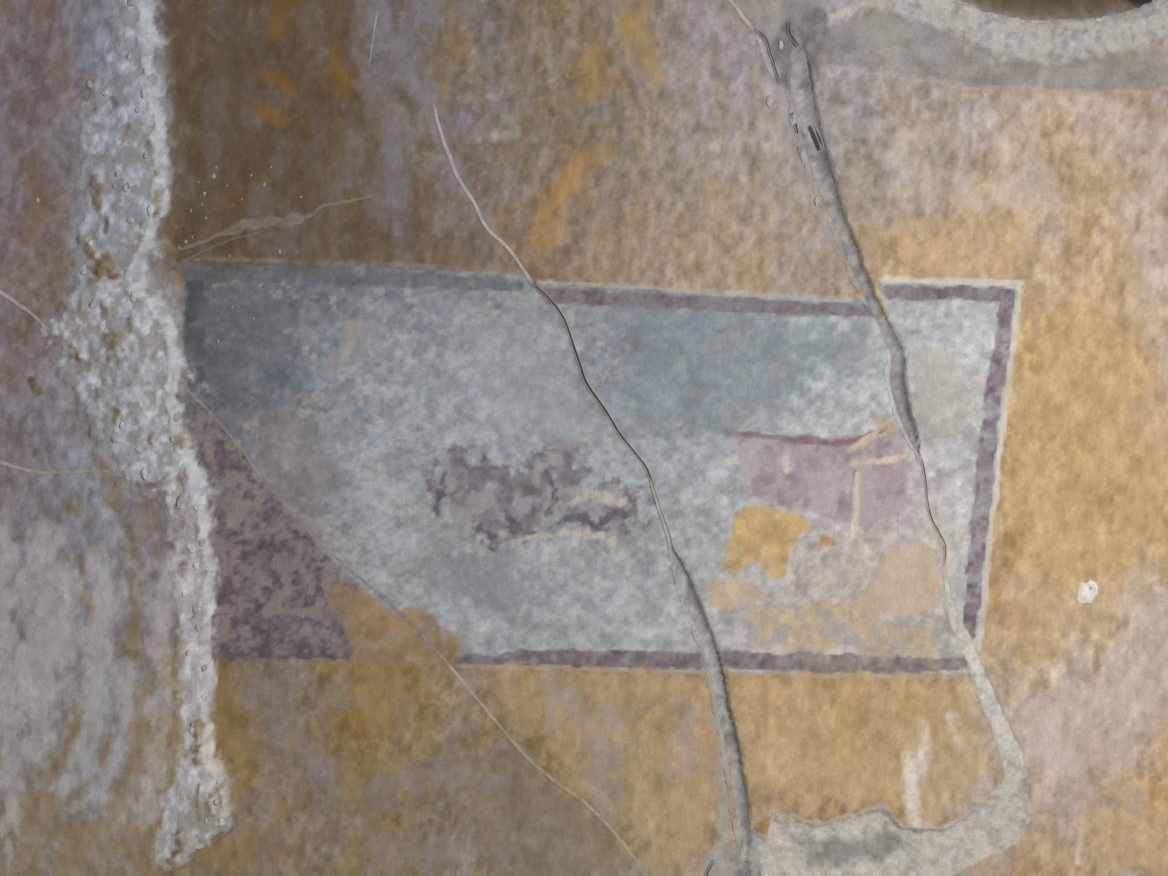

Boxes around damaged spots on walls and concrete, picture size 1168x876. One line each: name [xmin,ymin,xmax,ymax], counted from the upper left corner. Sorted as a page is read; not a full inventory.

crack [0,289,54,337]
crack [0,459,114,475]
leakage [0,0,489,876]
crack [181,386,648,876]
leakage [474,128,523,146]
crack [374,0,765,876]
crack [703,0,1030,788]